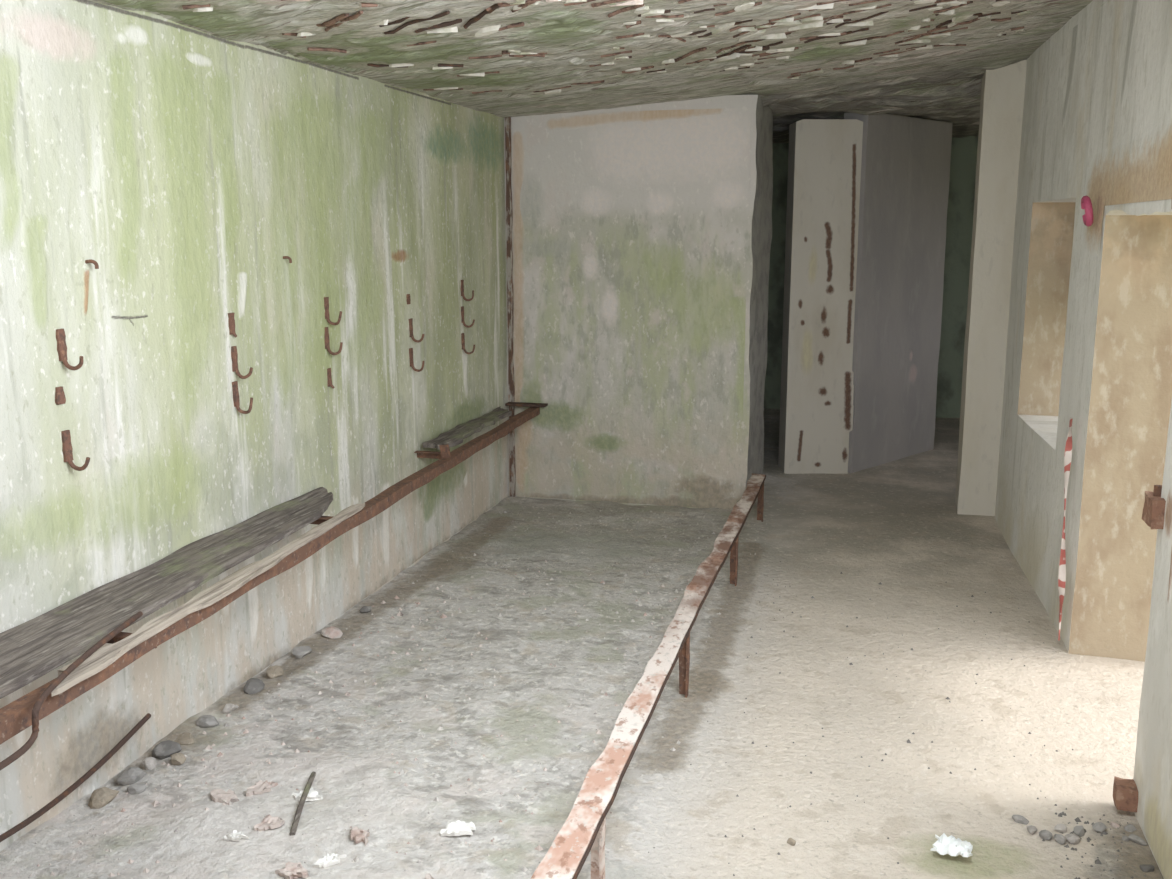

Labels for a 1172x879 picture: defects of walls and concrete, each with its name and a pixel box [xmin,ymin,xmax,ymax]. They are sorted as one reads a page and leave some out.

damp [0,6,143,296]
damp [205,66,248,320]
damp [257,105,302,427]
damp [338,101,392,393]
corrosion [797,143,858,369]
corrosion [796,429,823,468]
corrosion [816,370,854,465]